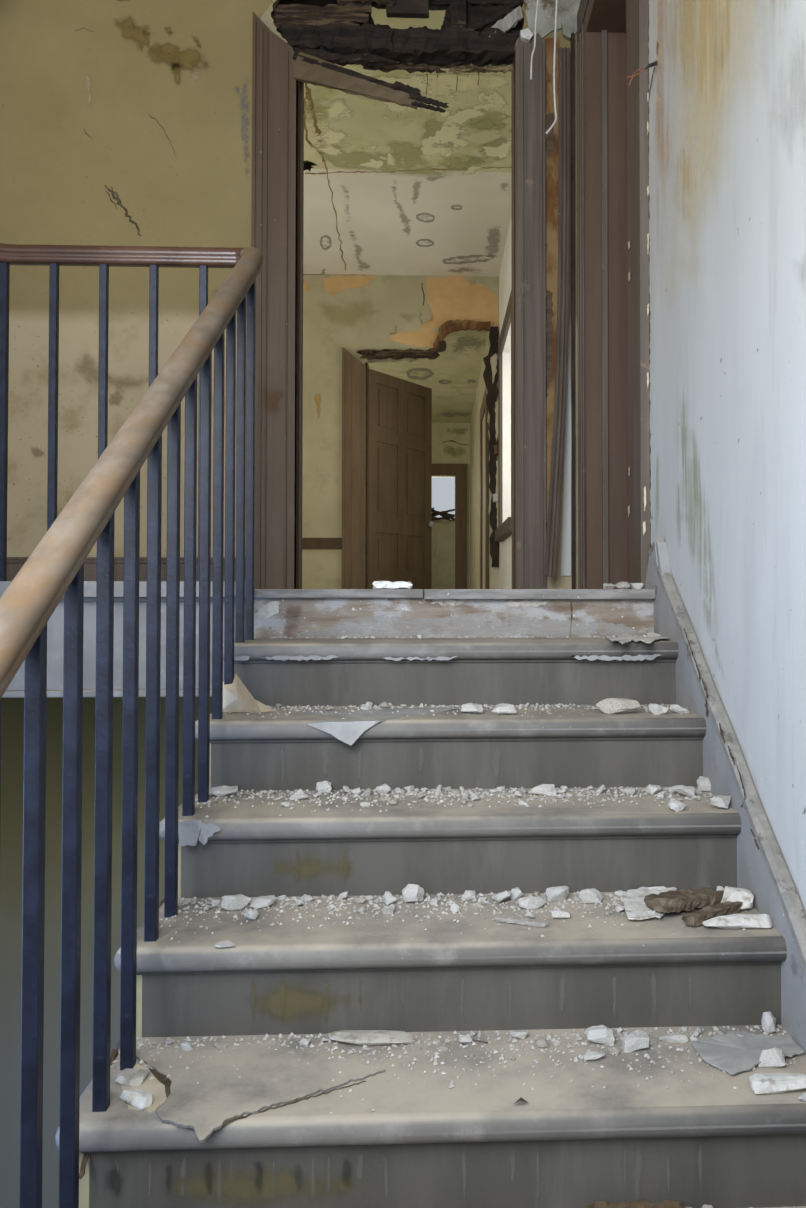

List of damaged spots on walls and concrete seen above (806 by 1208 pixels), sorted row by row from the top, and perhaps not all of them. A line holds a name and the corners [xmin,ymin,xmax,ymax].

water stain [116,18,207,83]
flaking render [260,0,581,174]
water stain [696,0,732,140]
crack [104,185,142,236]
crack [303,83,511,275]
flaking render [303,275,375,295]
flaking render [390,276,499,352]